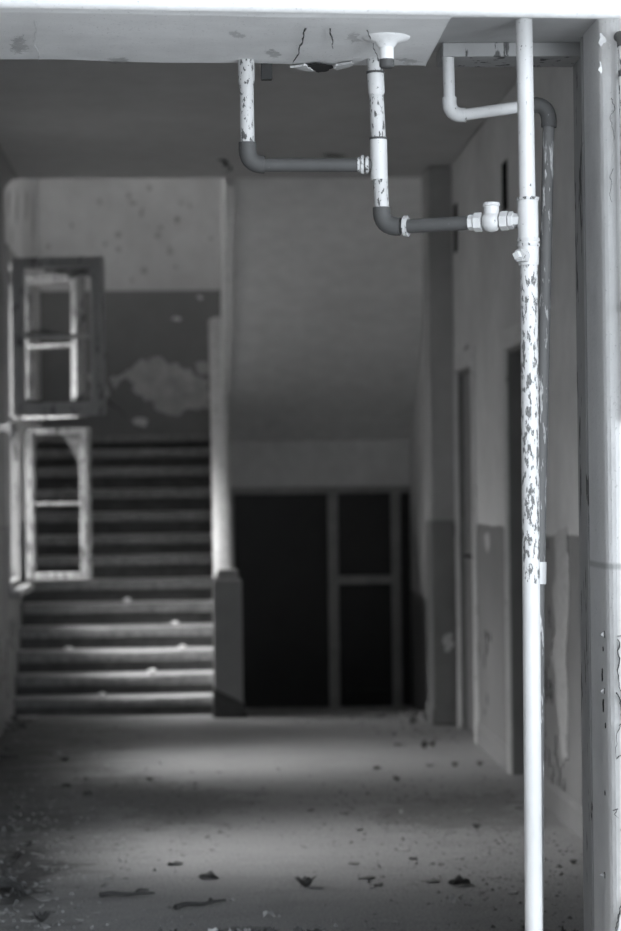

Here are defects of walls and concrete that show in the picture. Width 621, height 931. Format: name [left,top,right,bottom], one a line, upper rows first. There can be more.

peeling [544,526,570,792]